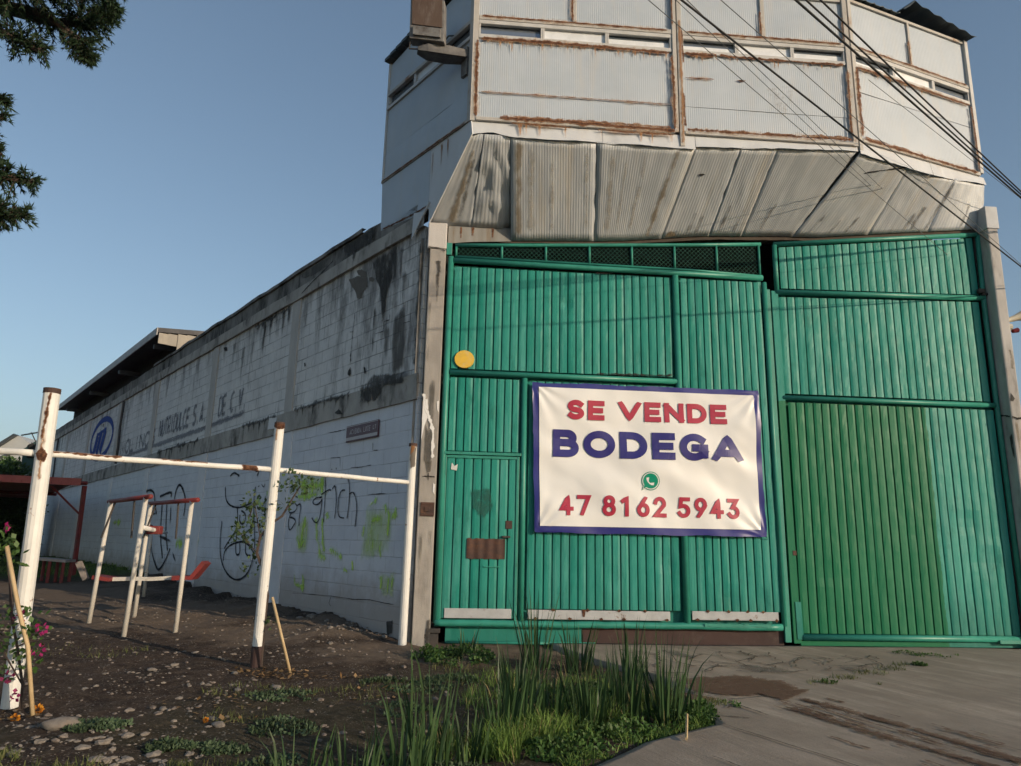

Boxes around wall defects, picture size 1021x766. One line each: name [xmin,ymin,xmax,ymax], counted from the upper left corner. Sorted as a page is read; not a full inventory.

corrosion [474,0,980,174]
corrosion [382,123,464,182]
leakage [372,249,405,350]
corrosion [35,387,122,479]
crack [619,649,887,766]